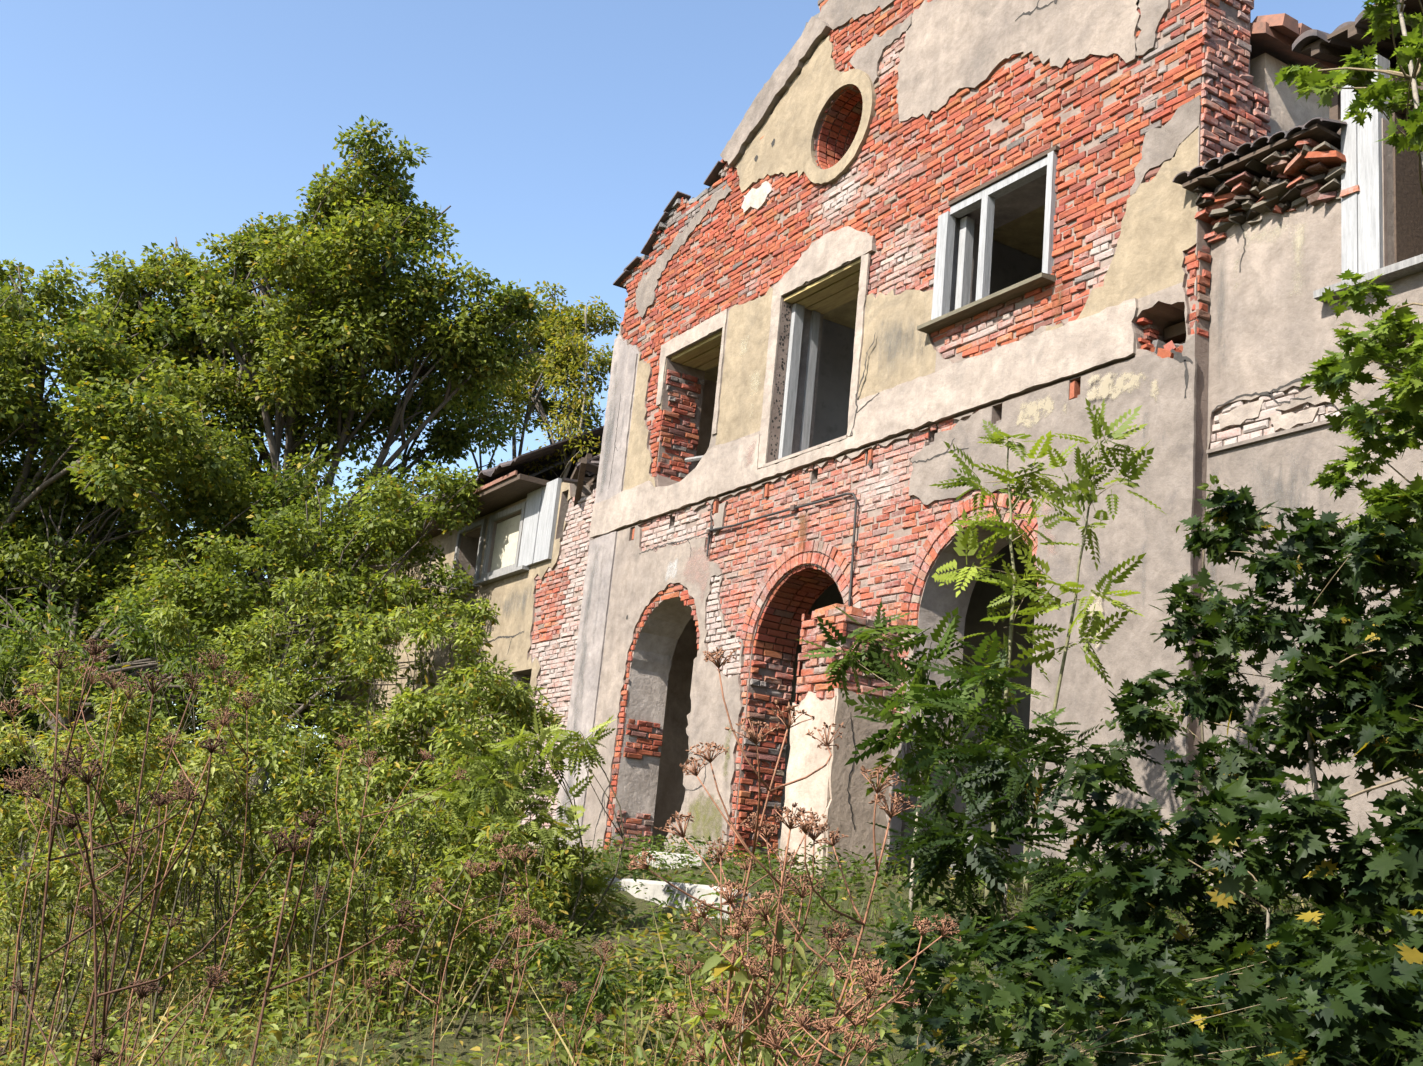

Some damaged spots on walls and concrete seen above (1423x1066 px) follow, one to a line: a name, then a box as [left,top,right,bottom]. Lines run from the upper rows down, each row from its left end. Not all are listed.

spalling [620,0,1271,477]
spalling [1210,387,1341,449]
spalling [522,489,596,848]
spalling [604,418,1042,861]
peeling [1088,593,1103,648]